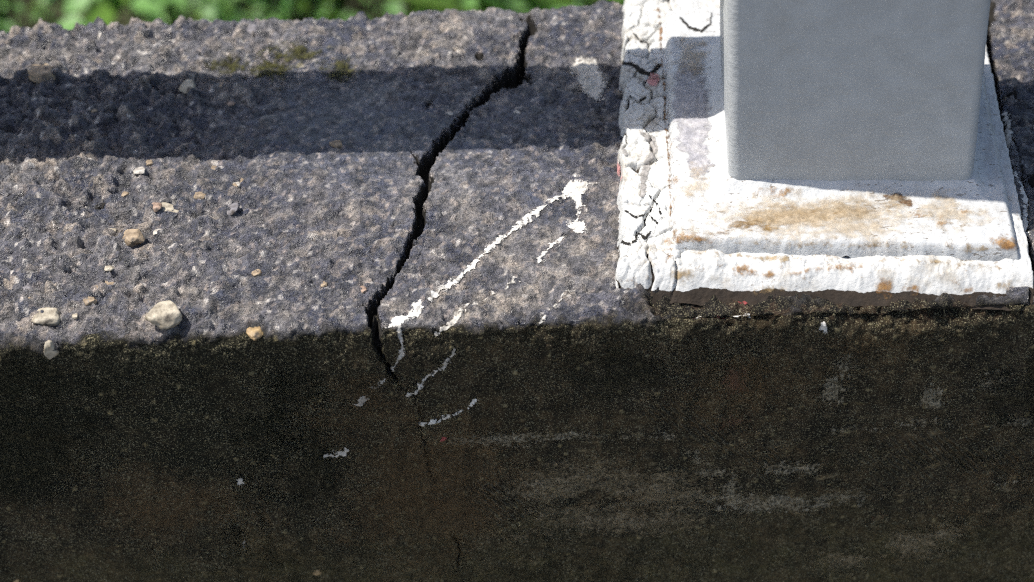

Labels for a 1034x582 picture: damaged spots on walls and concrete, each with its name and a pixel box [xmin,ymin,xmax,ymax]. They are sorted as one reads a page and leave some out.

crack [617,7,712,245]
rust [730,188,971,247]
crack [359,14,538,490]
rust [966,237,1016,252]
rust [737,254,789,291]
rust [876,281,891,292]
efflorescence [460,426,579,448]